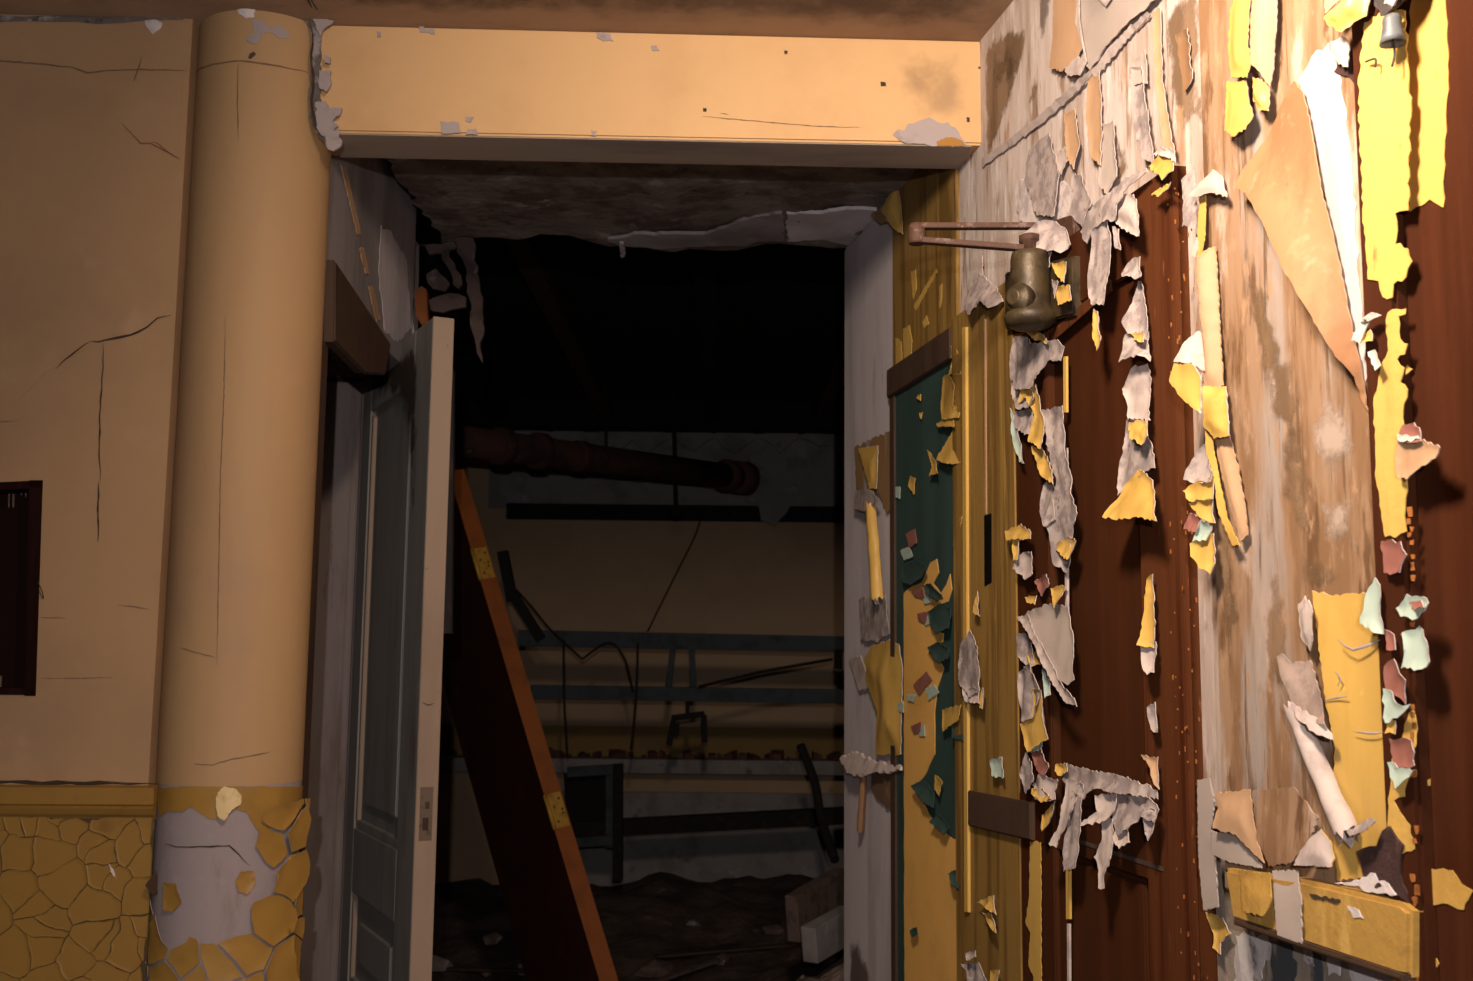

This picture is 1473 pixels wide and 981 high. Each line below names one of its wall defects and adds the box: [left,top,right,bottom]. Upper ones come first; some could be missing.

crack [122,123,180,159]
crack [0,0,342,152]
peeling [965,255,1003,315]
crack [56,315,170,538]
peeling [981,0,1450,889]
peeling [514,345,985,835]
crack [0,816,249,981]
peeling [145,786,311,981]
peeling [961,950,1000,981]
peeling [978,896,997,933]
peeling [1197,778,1400,981]
peeling [1432,868,1473,910]